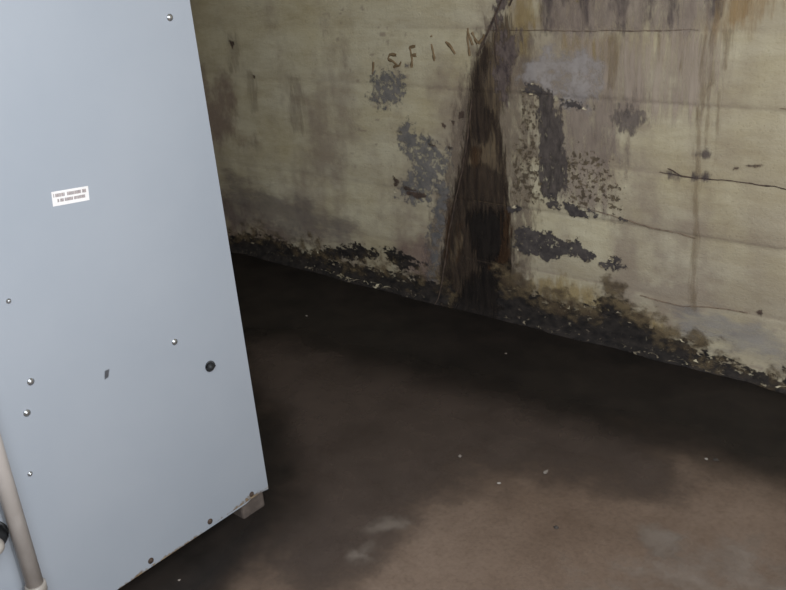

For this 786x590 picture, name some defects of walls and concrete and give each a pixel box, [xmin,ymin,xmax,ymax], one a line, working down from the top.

water stain [439,0,537,318]
water stain [542,0,723,215]
crack [661,168,786,190]
spalling [492,226,786,394]
water stain [118,252,786,590]